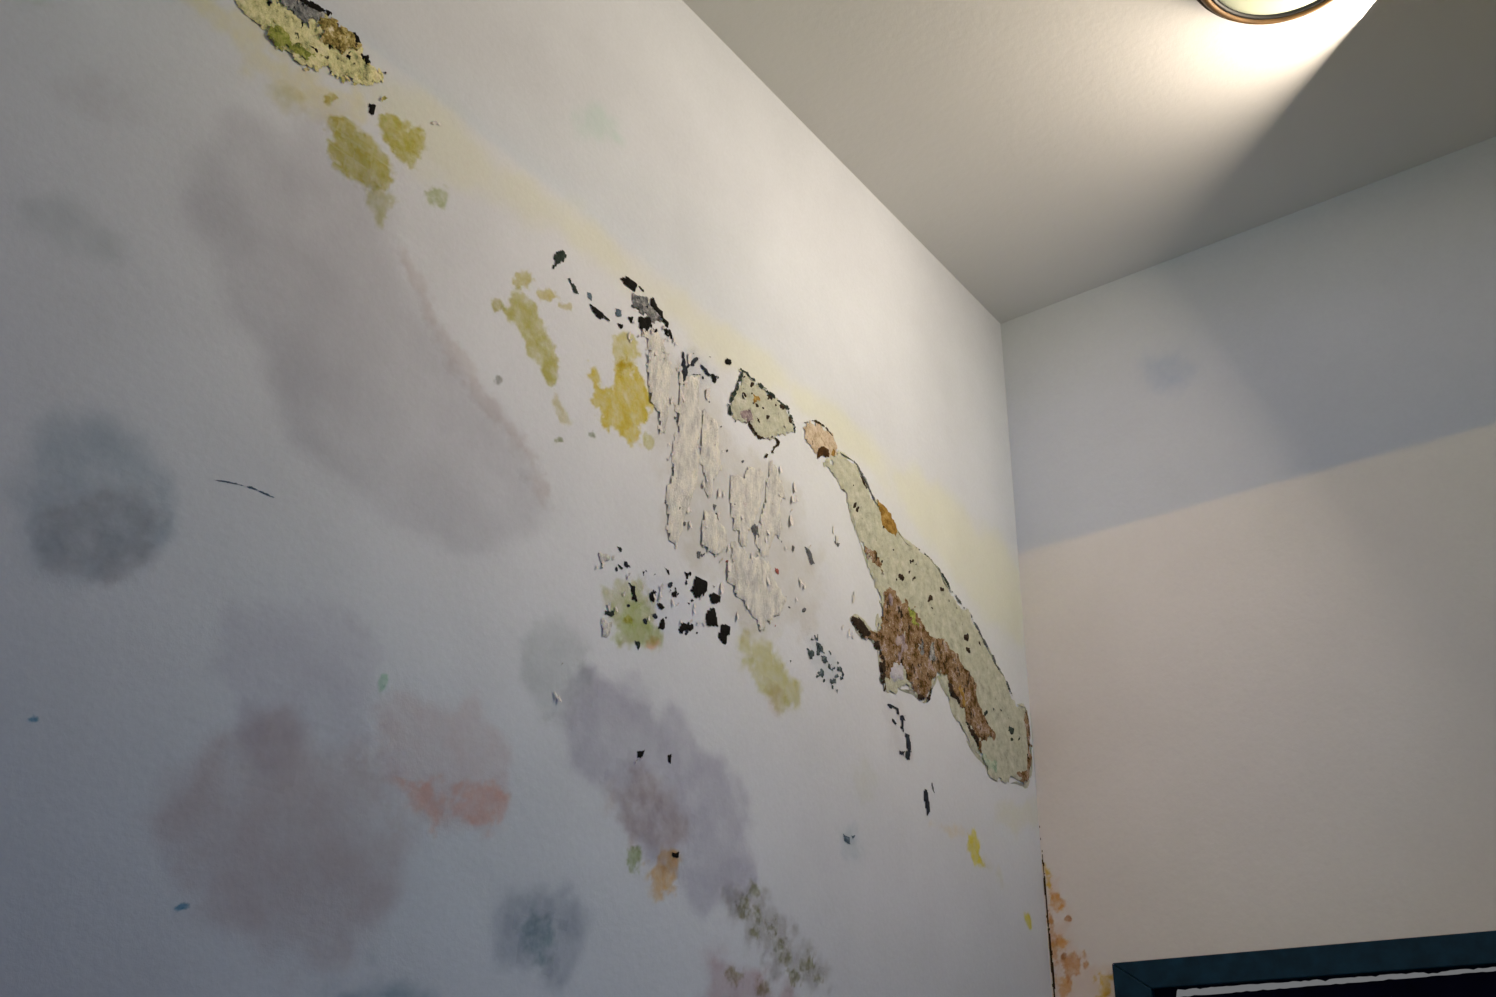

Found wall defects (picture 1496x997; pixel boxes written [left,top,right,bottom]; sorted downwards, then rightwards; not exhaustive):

flaking render [234,0,387,115]
flaking render [553,250,1033,789]